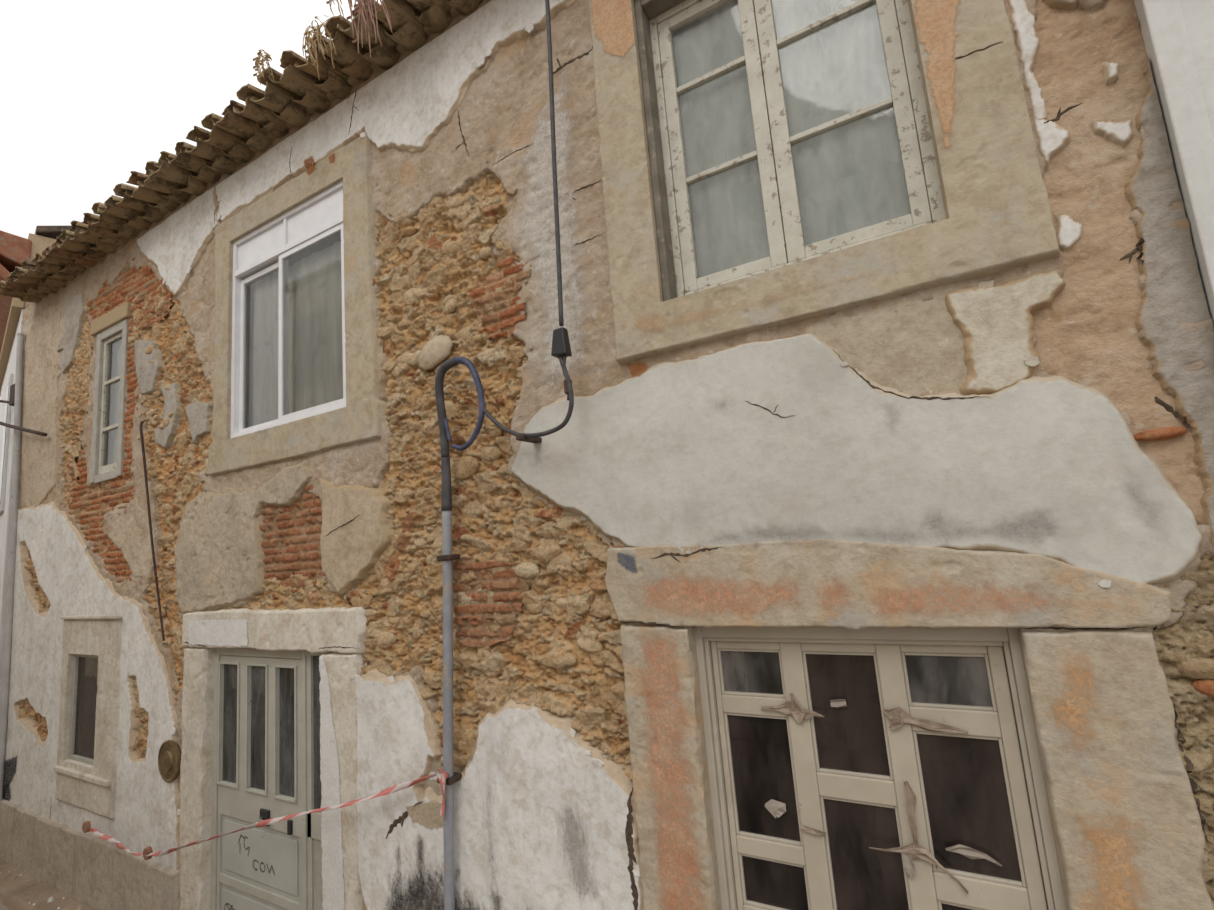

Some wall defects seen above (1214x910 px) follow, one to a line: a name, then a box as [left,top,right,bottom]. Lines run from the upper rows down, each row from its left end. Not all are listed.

crack [934,42,1001,64]
crack [455,112,551,165]
spalling [804,0,1205,525]
crack [1120,237,1145,265]
crack [747,401,794,418]
spalling [0,0,644,910]
crack [655,547,718,562]
spalling [1151,552,1214,900]
damp [387,840,475,910]
crack [625,787,638,910]